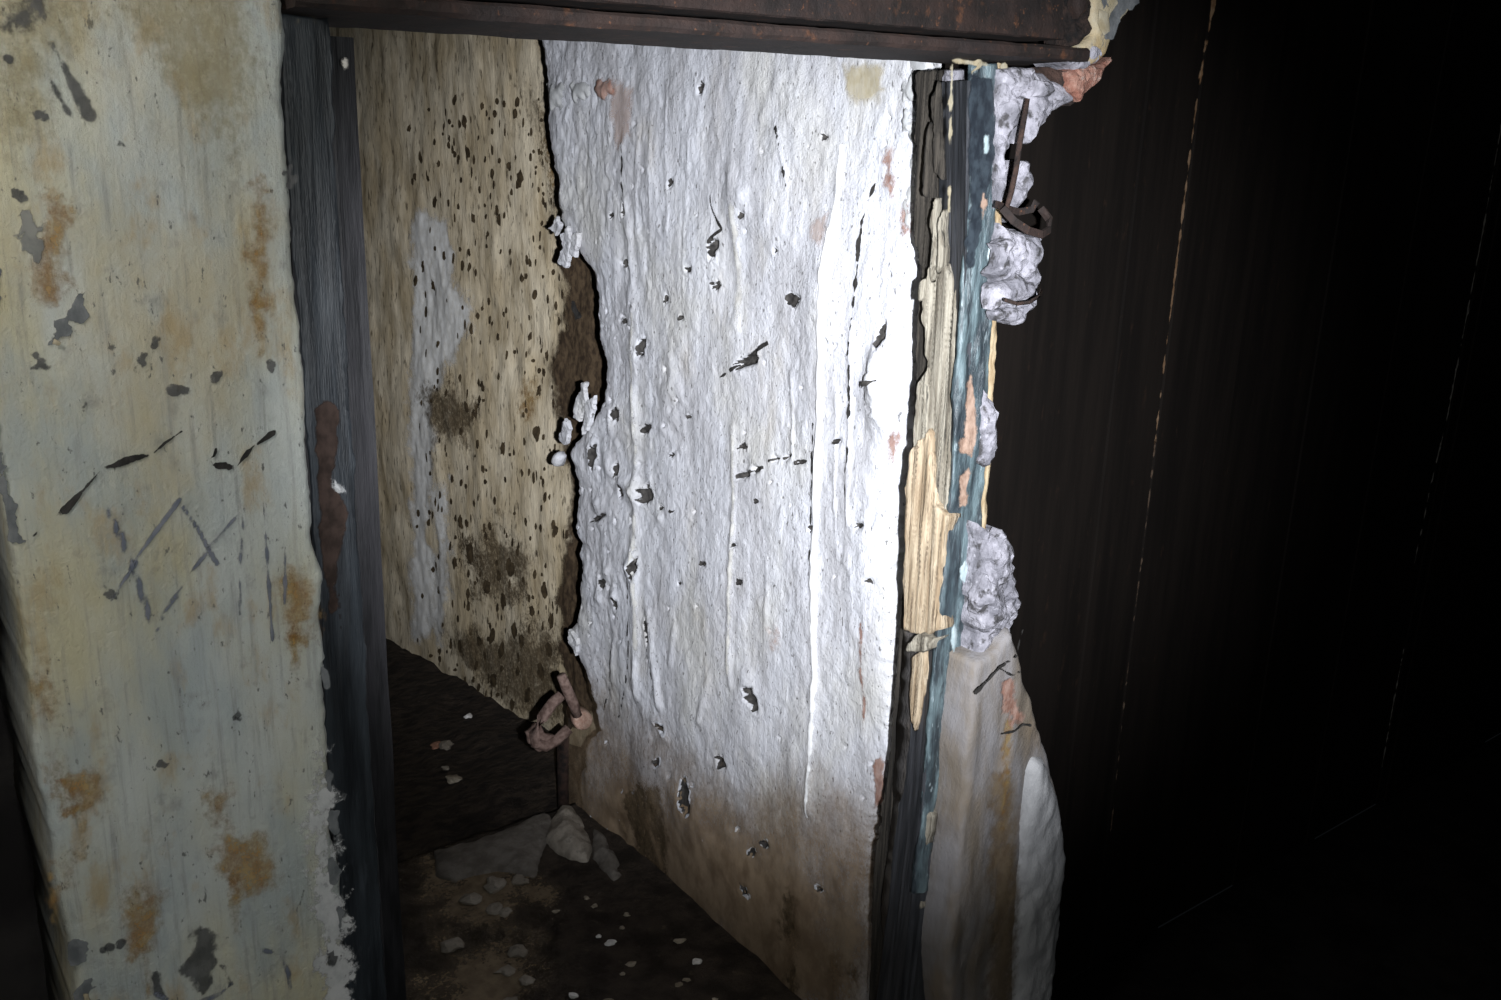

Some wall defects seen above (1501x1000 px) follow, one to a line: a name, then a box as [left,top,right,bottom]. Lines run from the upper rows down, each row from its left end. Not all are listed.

corrosion [1044,0,1092,47]
flaking render [546,79,614,111]
flaking render [942,68,968,82]
peeling [900,61,926,229]
flaking render [980,0,1139,325]
peeling [548,216,582,268]
leakage [407,94,568,721]
peeling [551,382,619,471]
spalling [613,463,675,513]
flaking render [959,376,1021,652]
leakage [569,144,875,1000]
peeling [568,629,580,656]